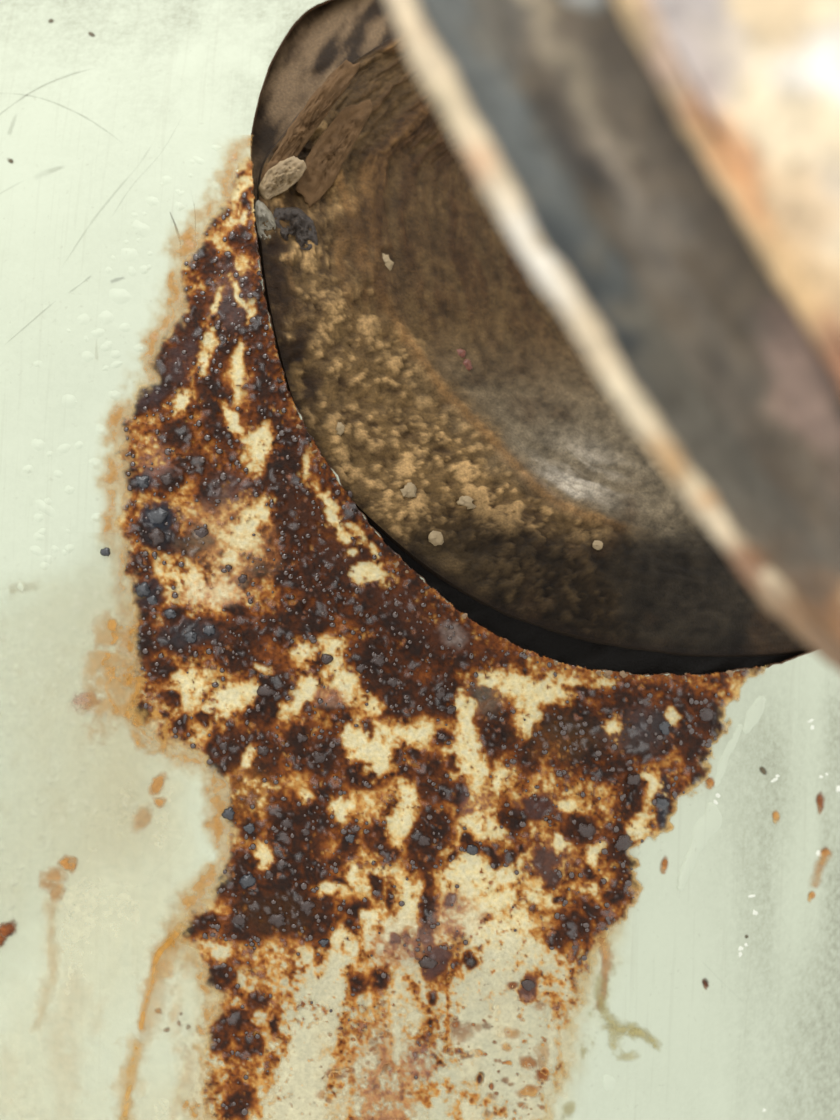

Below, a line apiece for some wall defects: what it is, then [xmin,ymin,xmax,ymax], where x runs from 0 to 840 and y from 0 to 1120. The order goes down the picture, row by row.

corrosion [100,138,766,1120]
corrosion [73,693,95,709]
corrosion [46,857,76,886]
corrosion [0,922,15,946]